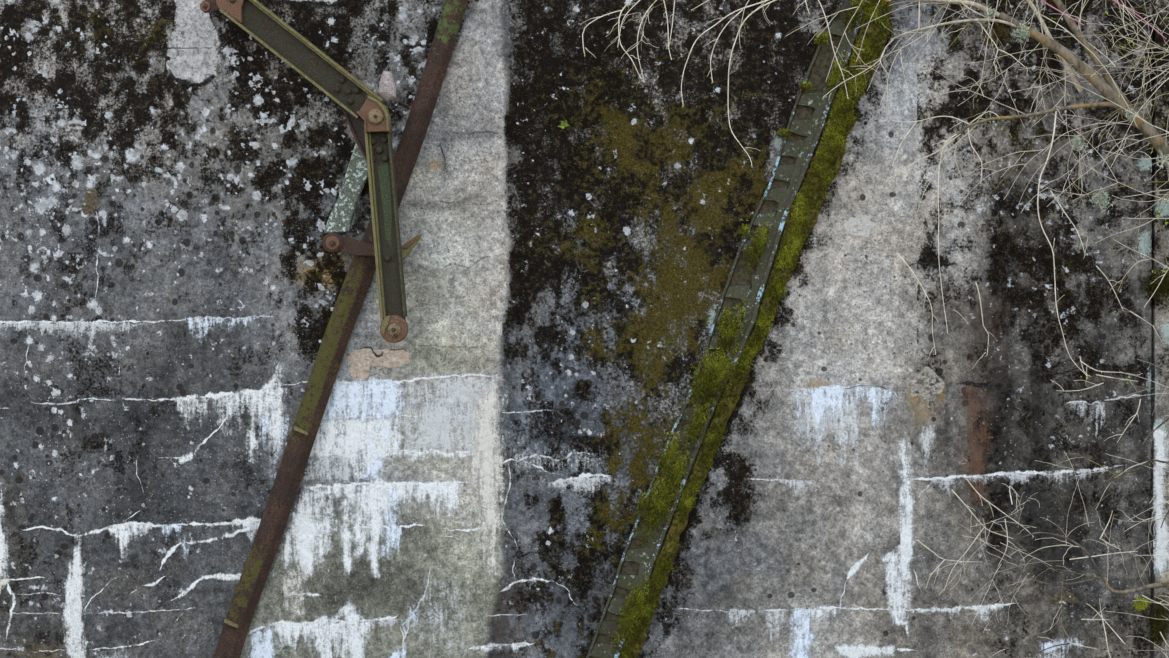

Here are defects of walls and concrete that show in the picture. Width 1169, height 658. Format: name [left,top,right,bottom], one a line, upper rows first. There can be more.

water stain [0,314,281,345]
crack [957,379,994,387]
crack [136,414,229,490]
water stain [249,373,505,658]
crack [487,452,590,616]
crack [9,576,199,650]
crack [840,553,869,609]